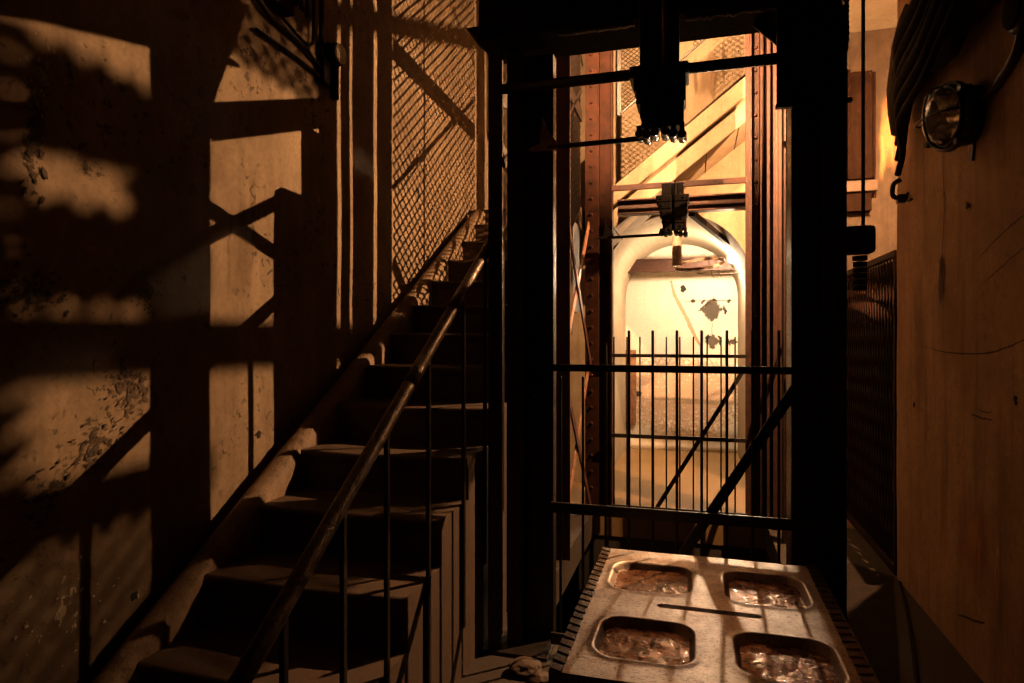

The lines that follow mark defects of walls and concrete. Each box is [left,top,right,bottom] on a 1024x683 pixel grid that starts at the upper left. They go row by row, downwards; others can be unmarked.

peeling [19,82,48,205]
spalling [680,285,731,321]
spalling [705,334,738,349]
peeling [17,358,167,529]